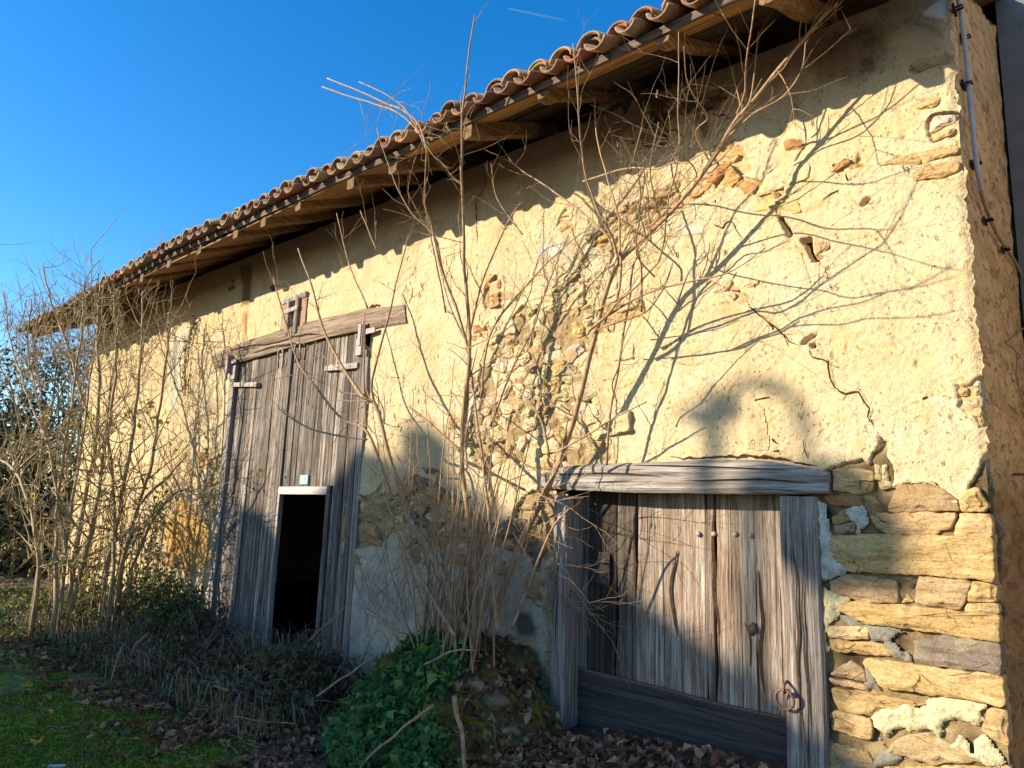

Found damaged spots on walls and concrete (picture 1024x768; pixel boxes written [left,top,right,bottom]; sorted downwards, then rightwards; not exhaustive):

spalling [830,152,864,177]
spalling [879,97,963,182]
spalling [341,125,811,696]
crack [747,300,874,427]
spalling [811,441,1013,768]